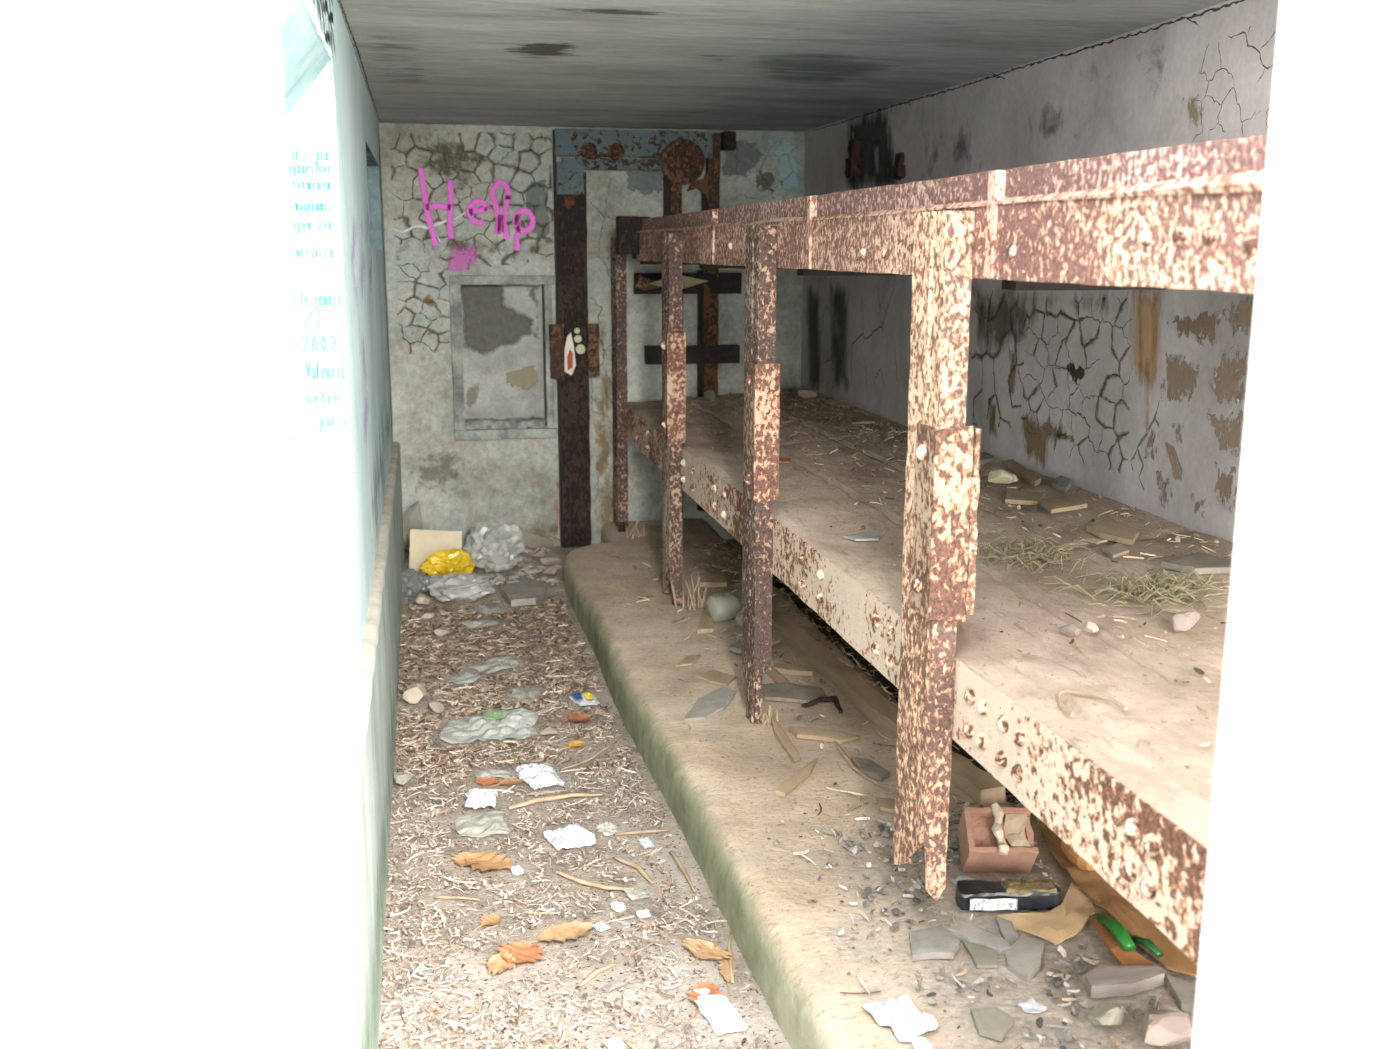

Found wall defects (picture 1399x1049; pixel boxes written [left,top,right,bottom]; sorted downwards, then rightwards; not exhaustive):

crack [338,0,554,354]
crack [735,0,1278,200]
peeling [506,366,538,390]
crack [589,186,613,418]
rust [1024,417,1062,466]
crack [970,290,1160,490]
rust [1135,296,1159,381]